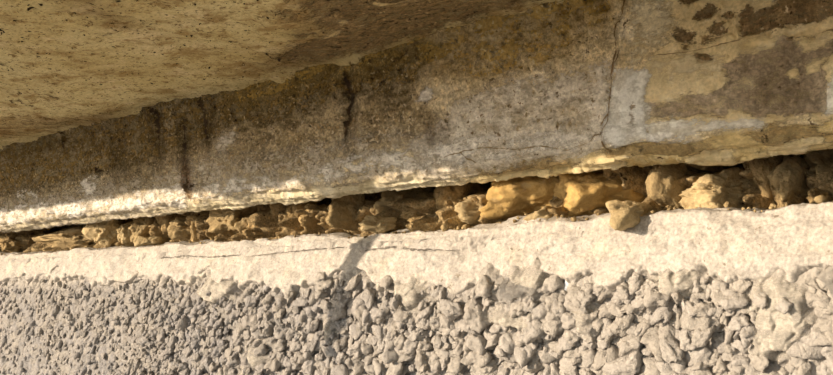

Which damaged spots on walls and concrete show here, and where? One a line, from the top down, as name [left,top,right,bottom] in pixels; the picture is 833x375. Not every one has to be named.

crack [149,108,160,152]
crack [182,96,208,198]
crack [342,74,354,141]
water stain [0,0,764,233]
crack [444,0,625,163]